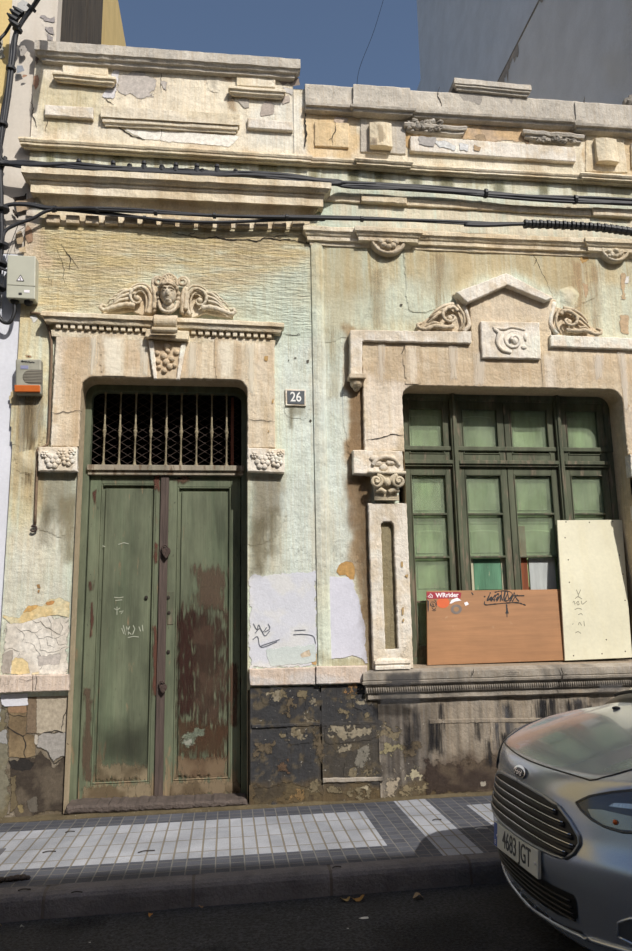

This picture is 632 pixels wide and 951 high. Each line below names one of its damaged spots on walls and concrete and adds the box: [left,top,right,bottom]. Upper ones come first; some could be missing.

peeling [102,70,167,99]
flaking render [121,127,239,147]
crack [172,232,325,249]
damp [248,468,292,570]
flaking render [0,597,70,675]
corrosion [173,563,239,759]
spalling [1,693,68,817]
damp [381,672,519,795]
damp [531,695,556,718]
damp [568,694,592,711]